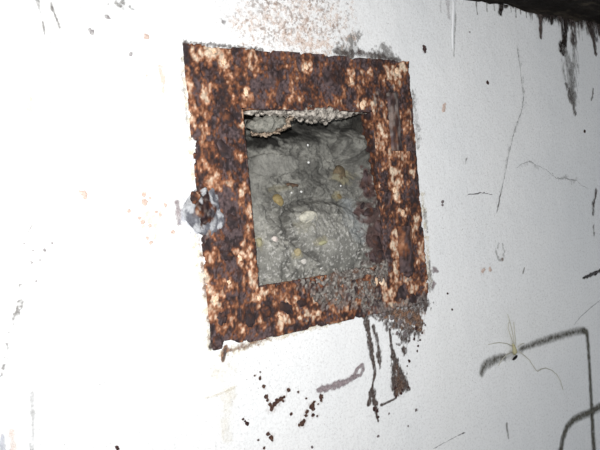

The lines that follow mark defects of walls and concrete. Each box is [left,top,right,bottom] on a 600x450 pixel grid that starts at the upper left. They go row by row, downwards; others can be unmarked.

water stain [494,4,600,115]
crack [468,47,589,210]
rust [219,340,259,362]
rust [362,300,434,422]